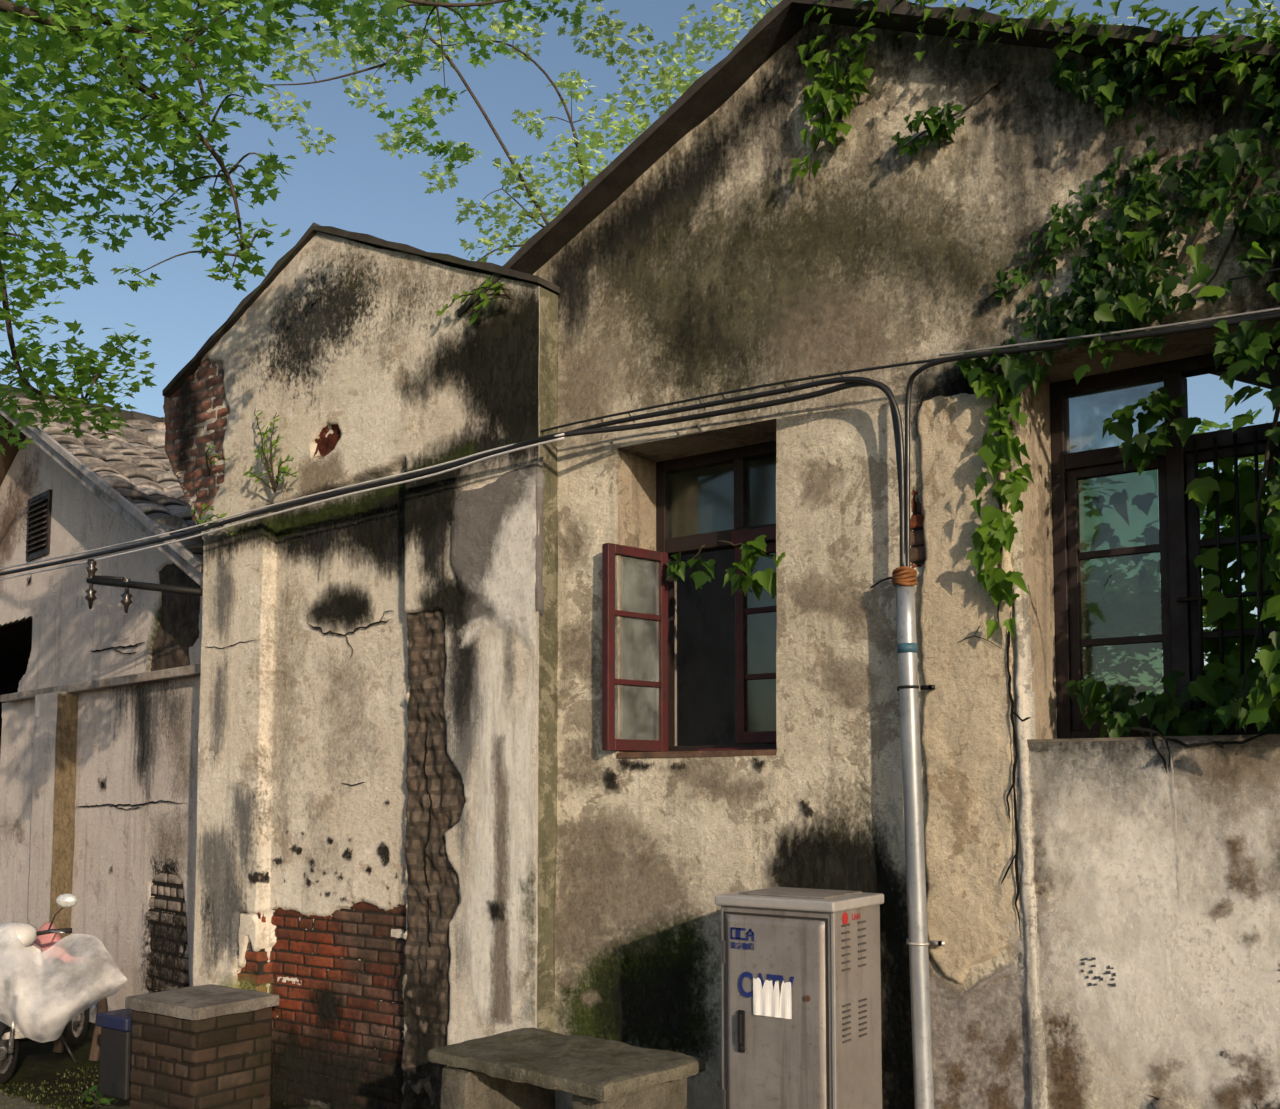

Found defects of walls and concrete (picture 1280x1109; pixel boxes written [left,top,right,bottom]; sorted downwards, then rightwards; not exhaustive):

flaking render [163,358,230,525]
spalling [314,423,341,459]
damp [204,23,1280,781]
flaking render [141,871,190,994]
damp [151,786,253,965]
flaking render [235,610,466,1109]
damp [488,739,511,1022]
damp [767,782,897,937]
damp [1029,740,1280,822]
crack [1126,727,1272,910]
rust [1226,836,1260,897]